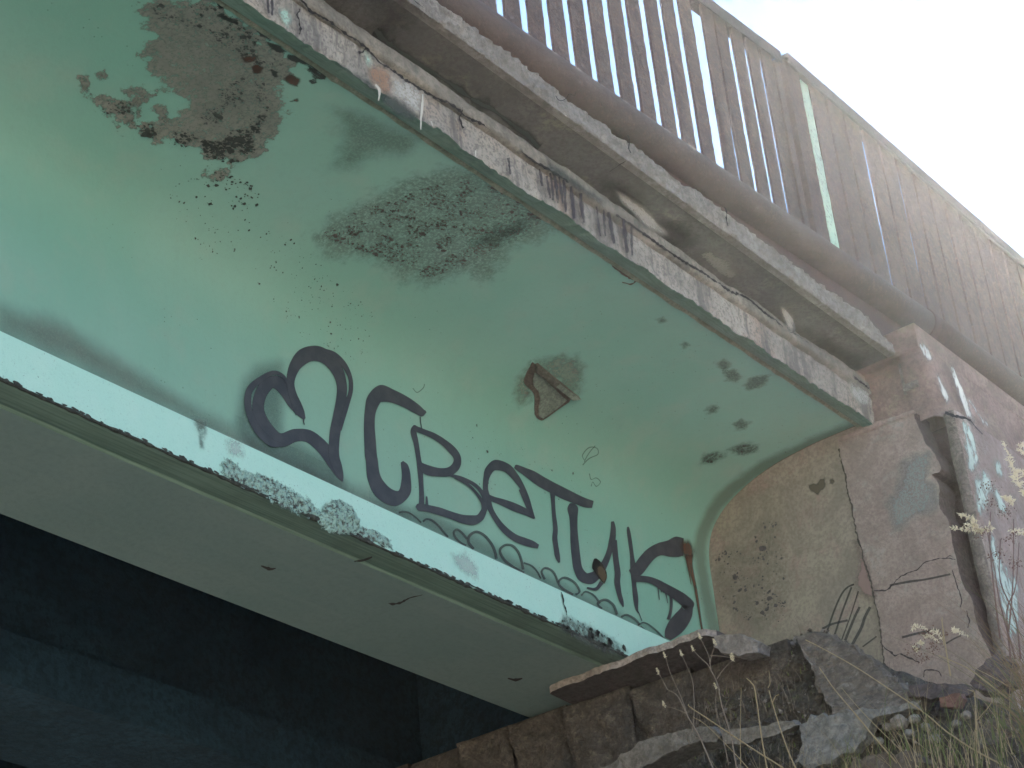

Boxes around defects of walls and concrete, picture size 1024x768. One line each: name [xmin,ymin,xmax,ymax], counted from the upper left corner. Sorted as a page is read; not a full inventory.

peeling [77,0,297,210]
water stain [539,164,687,255]
spalling [518,357,581,421]
spalling [0,377,280,504]
water stain [703,445,757,463]
spalling [293,505,321,523]
spalling [345,533,628,658]
rust [682,540,703,629]
crack [838,448,970,684]